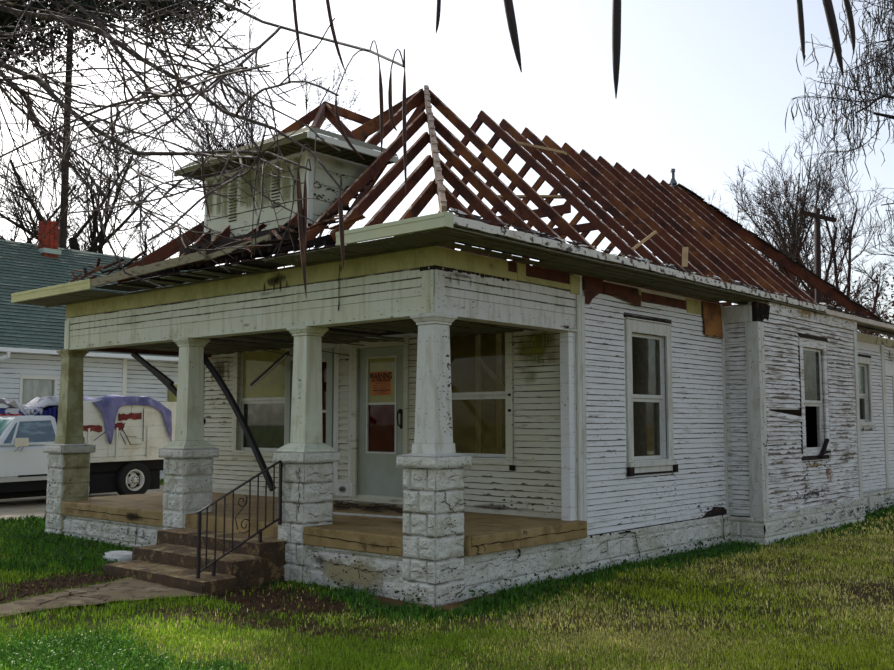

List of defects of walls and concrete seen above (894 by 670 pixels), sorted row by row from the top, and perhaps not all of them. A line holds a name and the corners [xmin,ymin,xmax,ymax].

water stain [264,275,287,290]
peeling [747,304,856,403]
peeling [750,383,882,538]
peeling [480,470,553,509]
spalling [543,475,726,565]
crack [472,528,587,559]
crack [600,531,640,557]